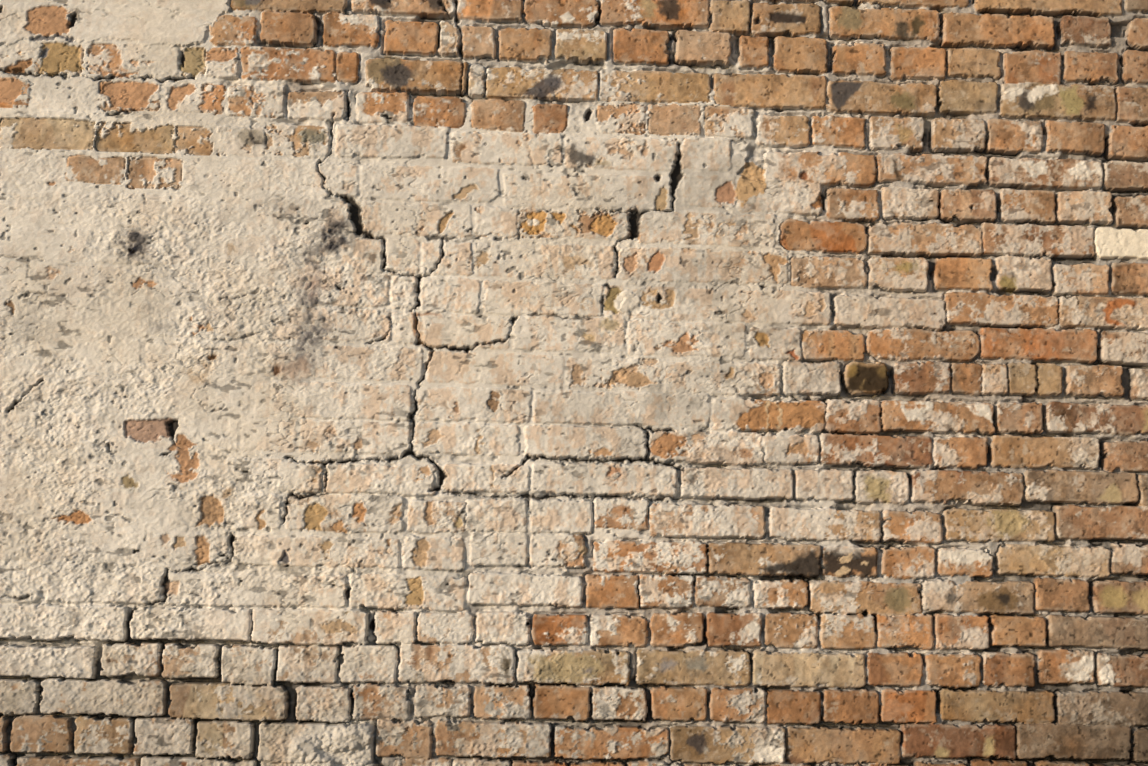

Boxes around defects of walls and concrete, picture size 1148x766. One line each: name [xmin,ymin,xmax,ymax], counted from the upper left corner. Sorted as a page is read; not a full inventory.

peeling [558,10,576,25]
spalling [0,4,238,127]
spalling [44,265,61,281]
crack [280,89,686,525]
spalling [120,473,141,493]
spalling [122,417,202,484]
spalling [159,485,236,568]